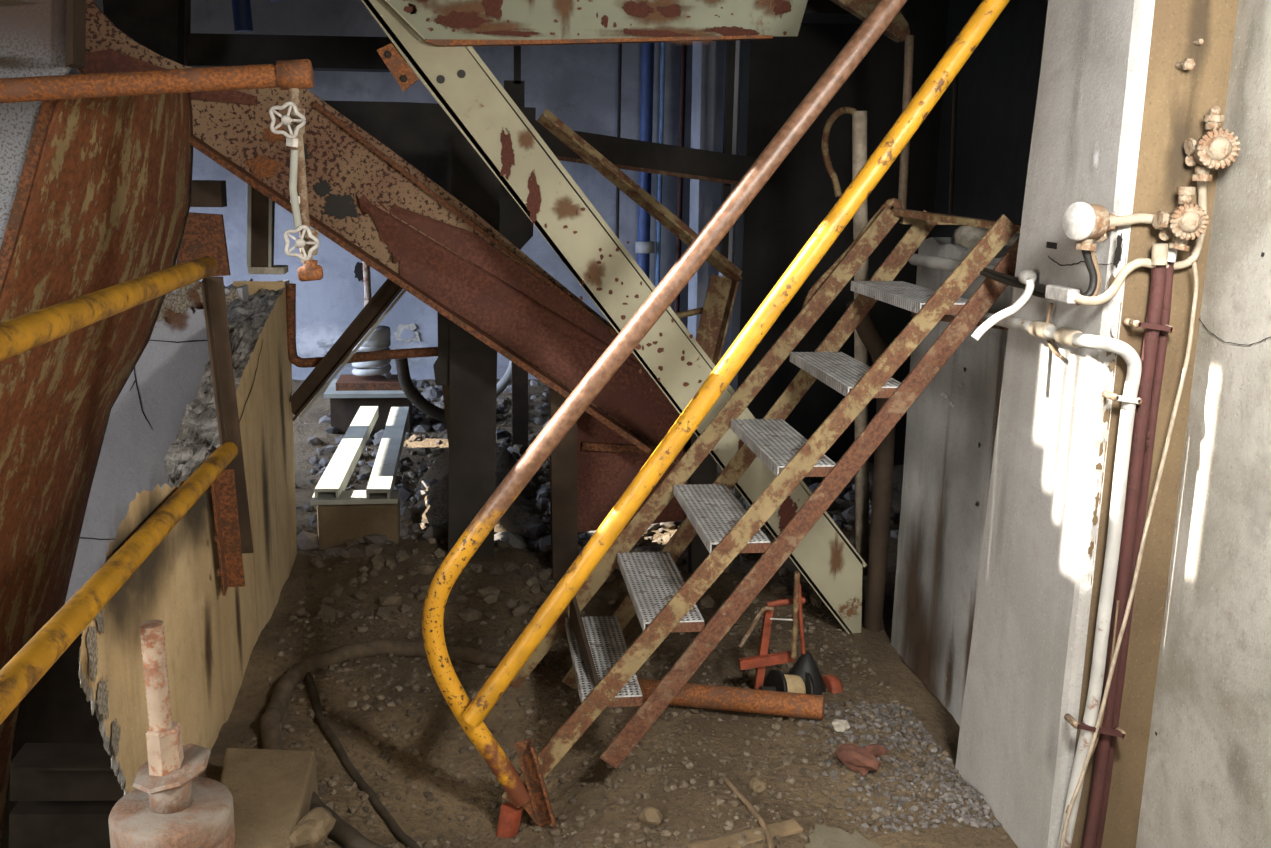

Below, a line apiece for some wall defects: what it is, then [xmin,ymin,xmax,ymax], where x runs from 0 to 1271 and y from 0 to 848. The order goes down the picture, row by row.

rust [403,0,760,37]
rust [756,0,791,35]
rust [500,127,533,179]
rust [525,169,585,234]
rust [568,241,642,320]
rust [636,333,664,391]
rust [991,358,1001,461]
rust [778,496,800,532]
rust [831,540,842,573]
rust [904,457,974,710]